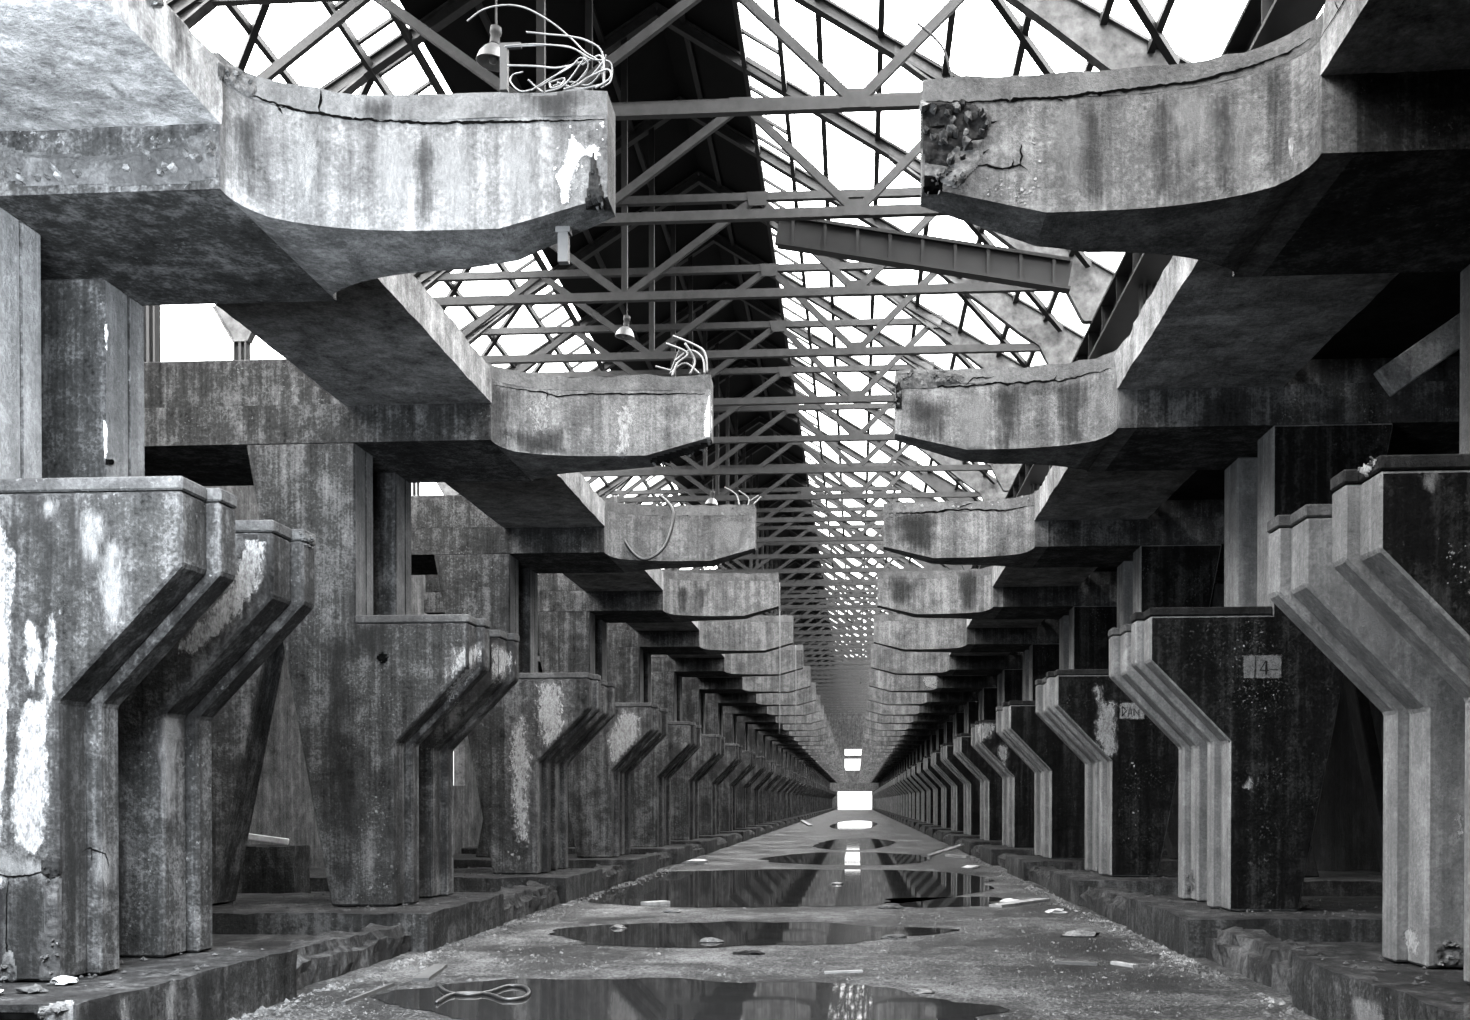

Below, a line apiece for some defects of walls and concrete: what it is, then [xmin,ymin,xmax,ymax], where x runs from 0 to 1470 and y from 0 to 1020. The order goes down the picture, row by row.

spalling [147,0,164,8]
crack [926,0,1345,170]
spalling [0,129,217,186]
damp [296,133,319,210]
damp [379,135,469,212]
spalling [553,121,605,210]
spalling [919,99,1041,205]
spalling [888,369,965,409]
damp [69,505,123,624]
damp [172,540,266,654]
damp [0,498,77,976]
damp [96,853,116,887]